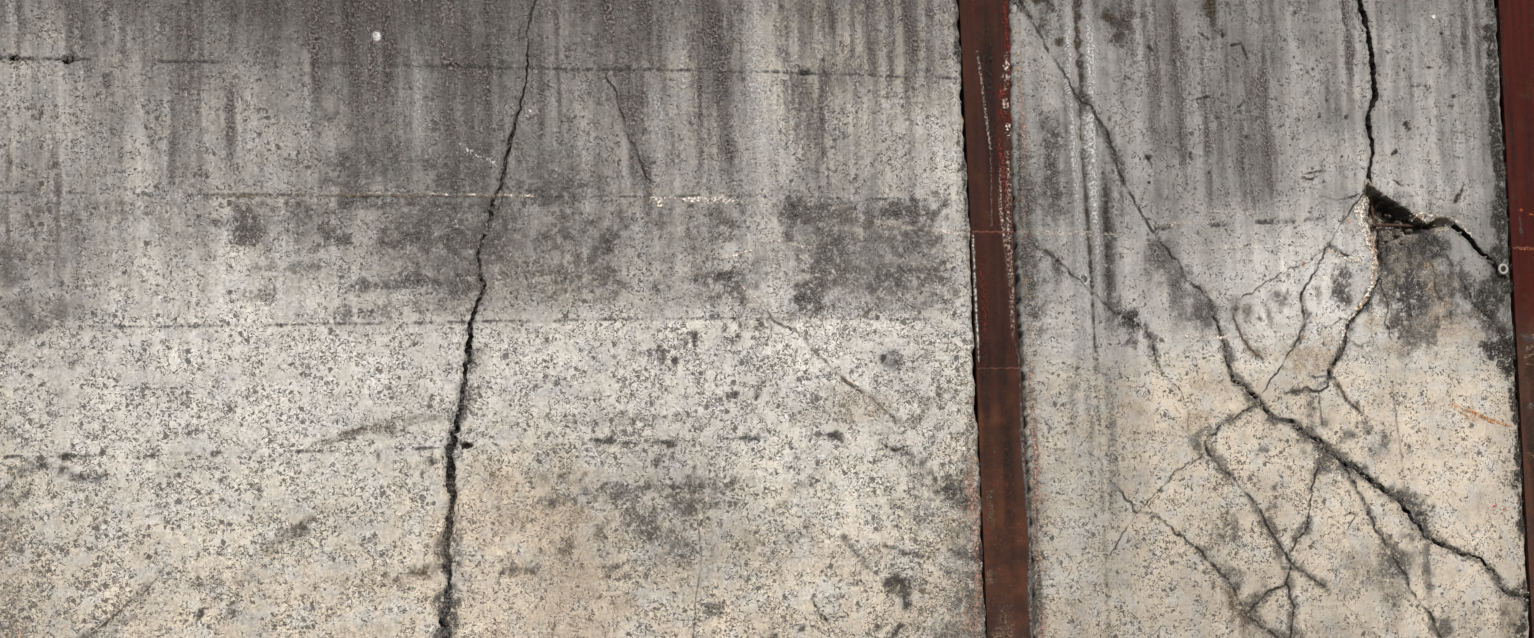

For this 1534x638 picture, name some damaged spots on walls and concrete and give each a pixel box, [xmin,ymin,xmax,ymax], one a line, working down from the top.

damp [50,166,62,236]
damp [223,0,500,152]
crack [434,0,536,638]
damp [580,0,762,209]
damp [778,0,935,189]
damp [1064,0,1137,351]
damp [1120,0,1278,212]
damp [1145,238,1338,370]
crack [1014,0,1529,638]
damp [1326,0,1354,134]
spalling [1334,179,1472,351]
damp [1442,0,1483,78]